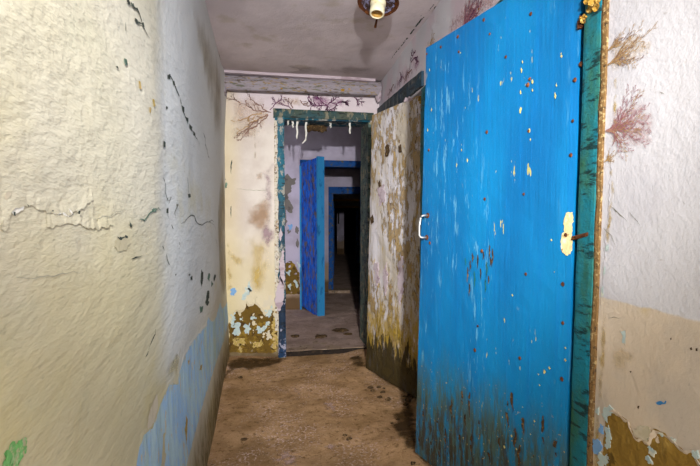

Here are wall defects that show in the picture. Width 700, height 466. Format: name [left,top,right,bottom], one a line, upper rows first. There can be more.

damp [607,20,658,70]
damp [226,92,365,141]
damp [604,83,651,162]
damp [254,206,271,241]
peeling [397,256,405,305]
peeling [134,250,300,466]
flaking render [592,405,700,466]